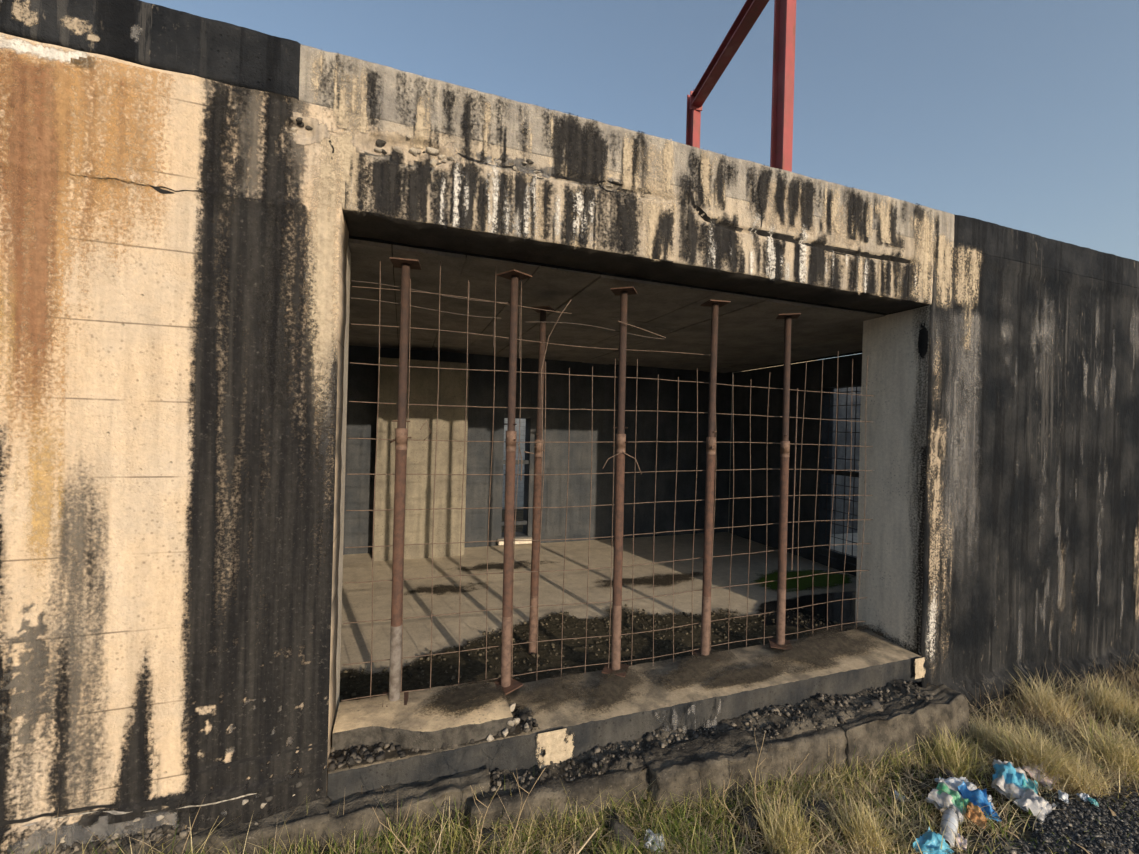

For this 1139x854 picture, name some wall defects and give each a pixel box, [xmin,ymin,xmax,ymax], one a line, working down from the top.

rust [0,36,170,570]
crack [58,171,200,194]
leakage [42,55,981,832]
crack [691,178,910,263]
leakage [1032,298,1054,382]
leakage [1083,338,1116,407]
leakage [1018,453,1064,662]
leakage [0,646,51,854]